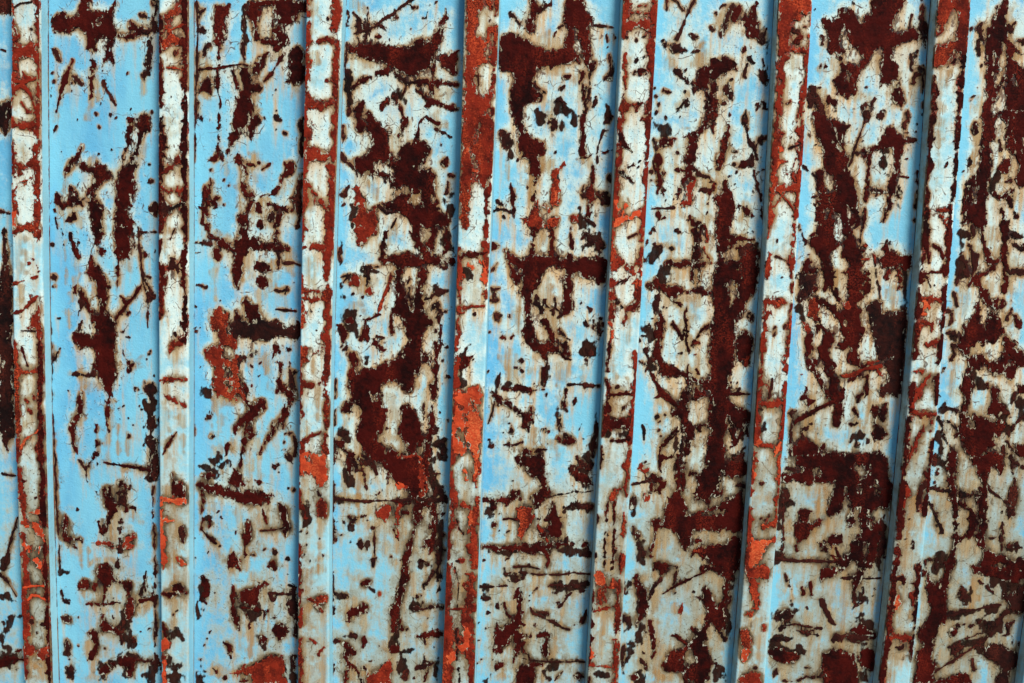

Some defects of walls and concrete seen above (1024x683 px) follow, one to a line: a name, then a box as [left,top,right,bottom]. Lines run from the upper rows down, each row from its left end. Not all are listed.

peeling [778,0,816,53]
peeling [909,0,970,93]
peeling [619,132,654,183]
rust [0,0,790,683]
peeling [580,257,650,339]
rust [768,0,1024,683]
peeling [917,242,946,348]
peeling [605,385,633,443]
peeling [279,451,337,574]
peeling [893,369,948,611]
peeling [565,484,626,679]
peeling [738,514,775,683]